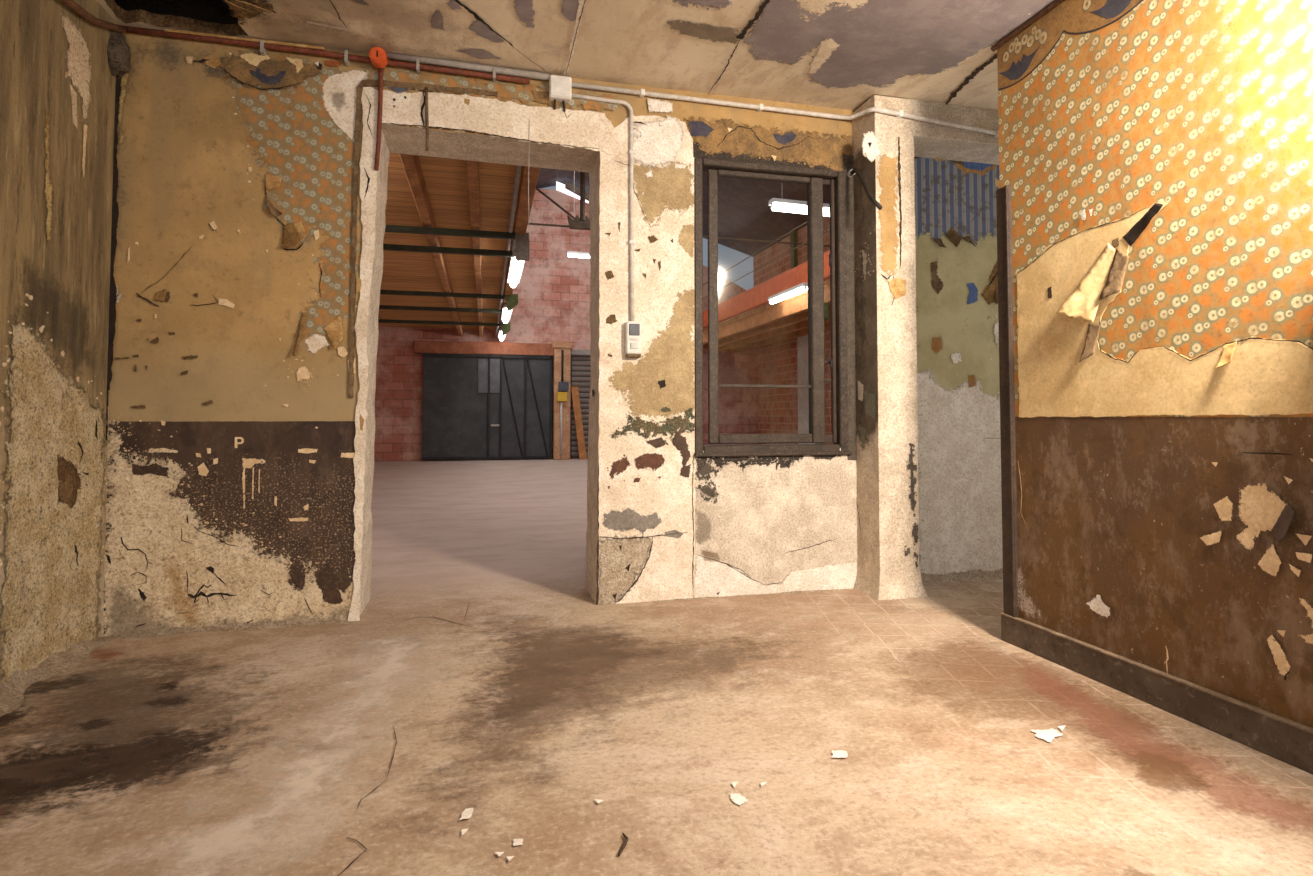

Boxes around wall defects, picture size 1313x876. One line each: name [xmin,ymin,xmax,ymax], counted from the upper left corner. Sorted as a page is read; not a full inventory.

peeling [457,20,504,60]
peeling [513,0,535,28]
peeling [667,0,1054,89]
flaking render [0,61,857,684]
peeling [858,381,877,444]
peeling [1200,476,1312,577]
peeling [1267,598,1313,681]
damp [0,711,26,727]
damp [23,680,71,695]
damp [145,682,188,707]
damp [0,719,229,815]
crack [338,726,397,876]